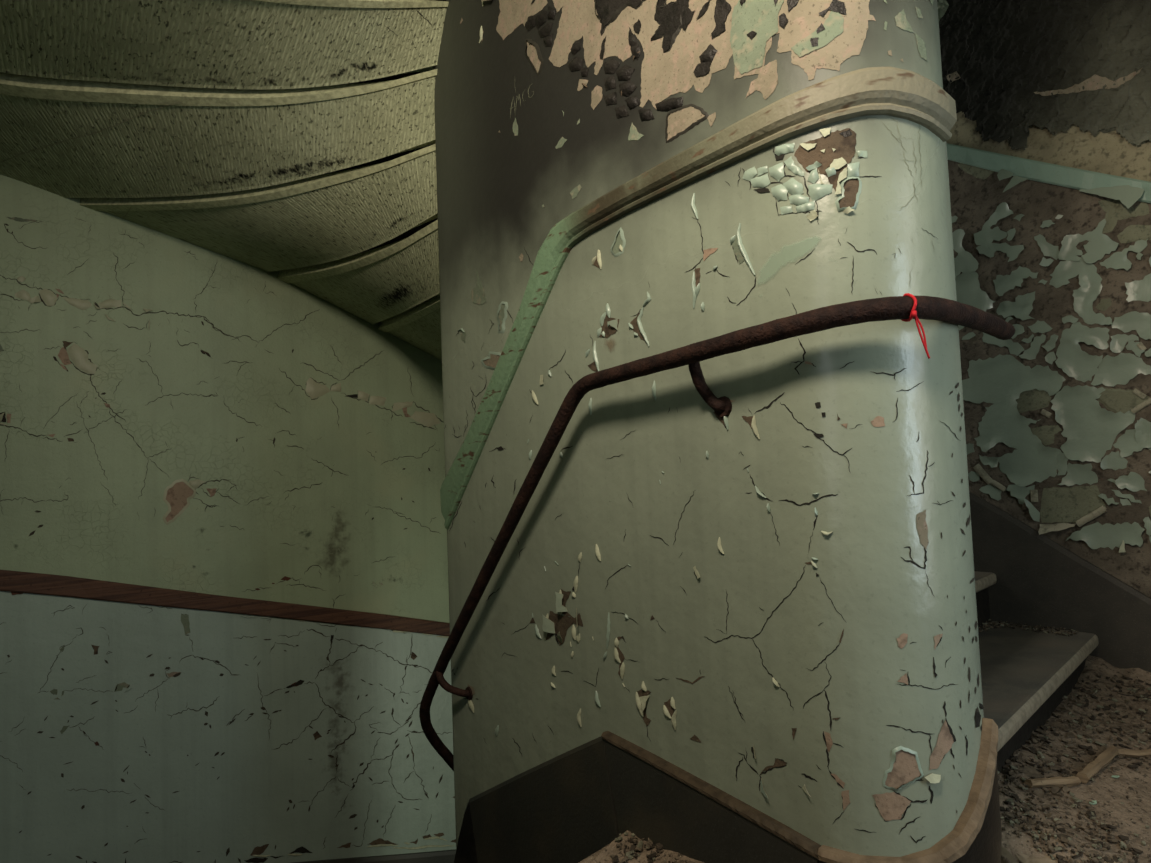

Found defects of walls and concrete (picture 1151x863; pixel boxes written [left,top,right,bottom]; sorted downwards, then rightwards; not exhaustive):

peeling [479,0,949,143]
peeling [835,177,862,214]
crack [786,289,924,419]
peeling [949,163,1151,553]
peeling [154,475,237,525]
peeling [501,544,601,658]
crack [706,565,844,730]
crack [741,404,852,546]
crack [901,546,933,594]
crack [909,421,959,505]
crack [0,604,455,847]
peeling [873,658,984,821]